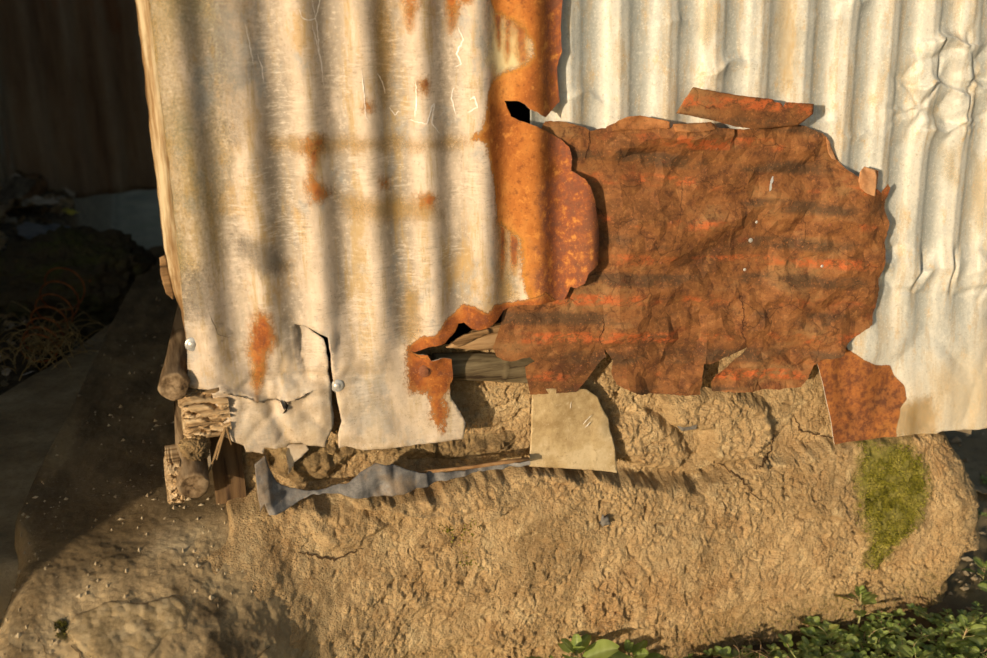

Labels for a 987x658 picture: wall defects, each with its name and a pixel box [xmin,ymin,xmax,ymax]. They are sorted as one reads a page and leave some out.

rust [405,0,907,445]
rust [248,312,277,390]
crack [793,415,833,439]
crack [717,434,774,500]